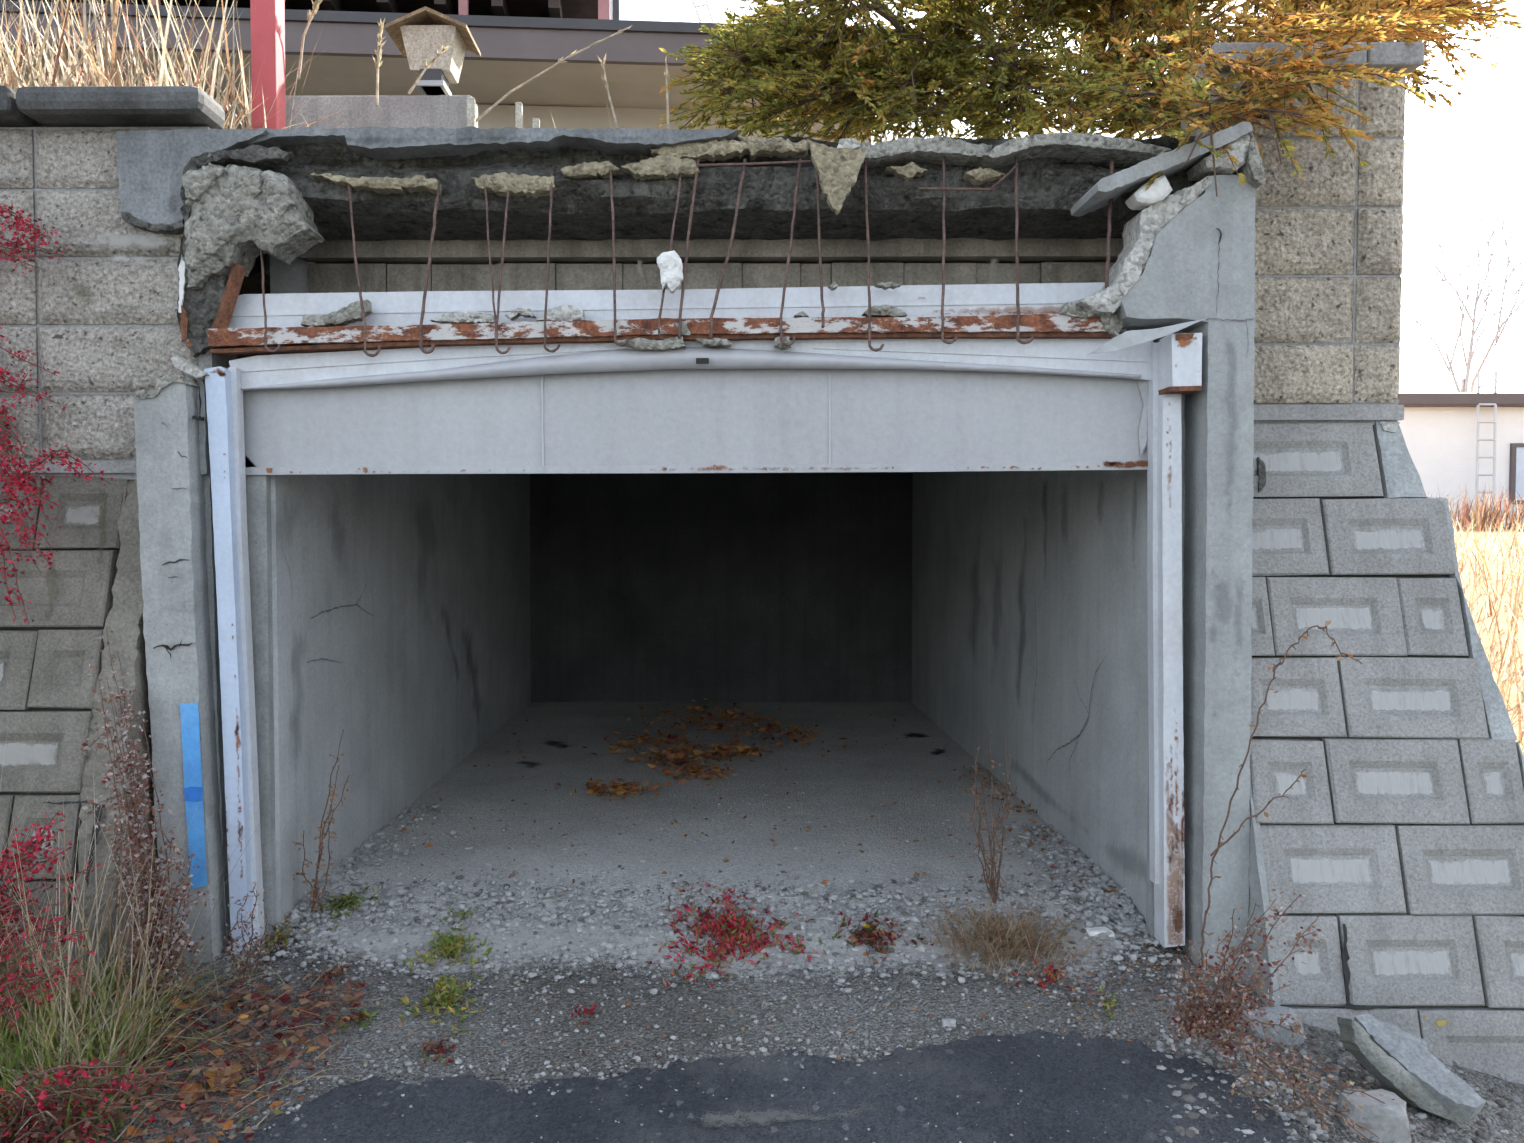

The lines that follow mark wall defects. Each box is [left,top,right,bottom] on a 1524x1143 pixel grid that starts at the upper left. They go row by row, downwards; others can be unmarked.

spalling [310,173,442,195]
spalling [470,135,809,199]
spalling [837,132,1171,185]
spalling [1076,176,1212,316]
peeling [1087,318,1207,355]
crack [311,580,374,619]
crack [153,640,196,658]
crack [1047,659,1104,790]
rust [1167,730,1185,944]